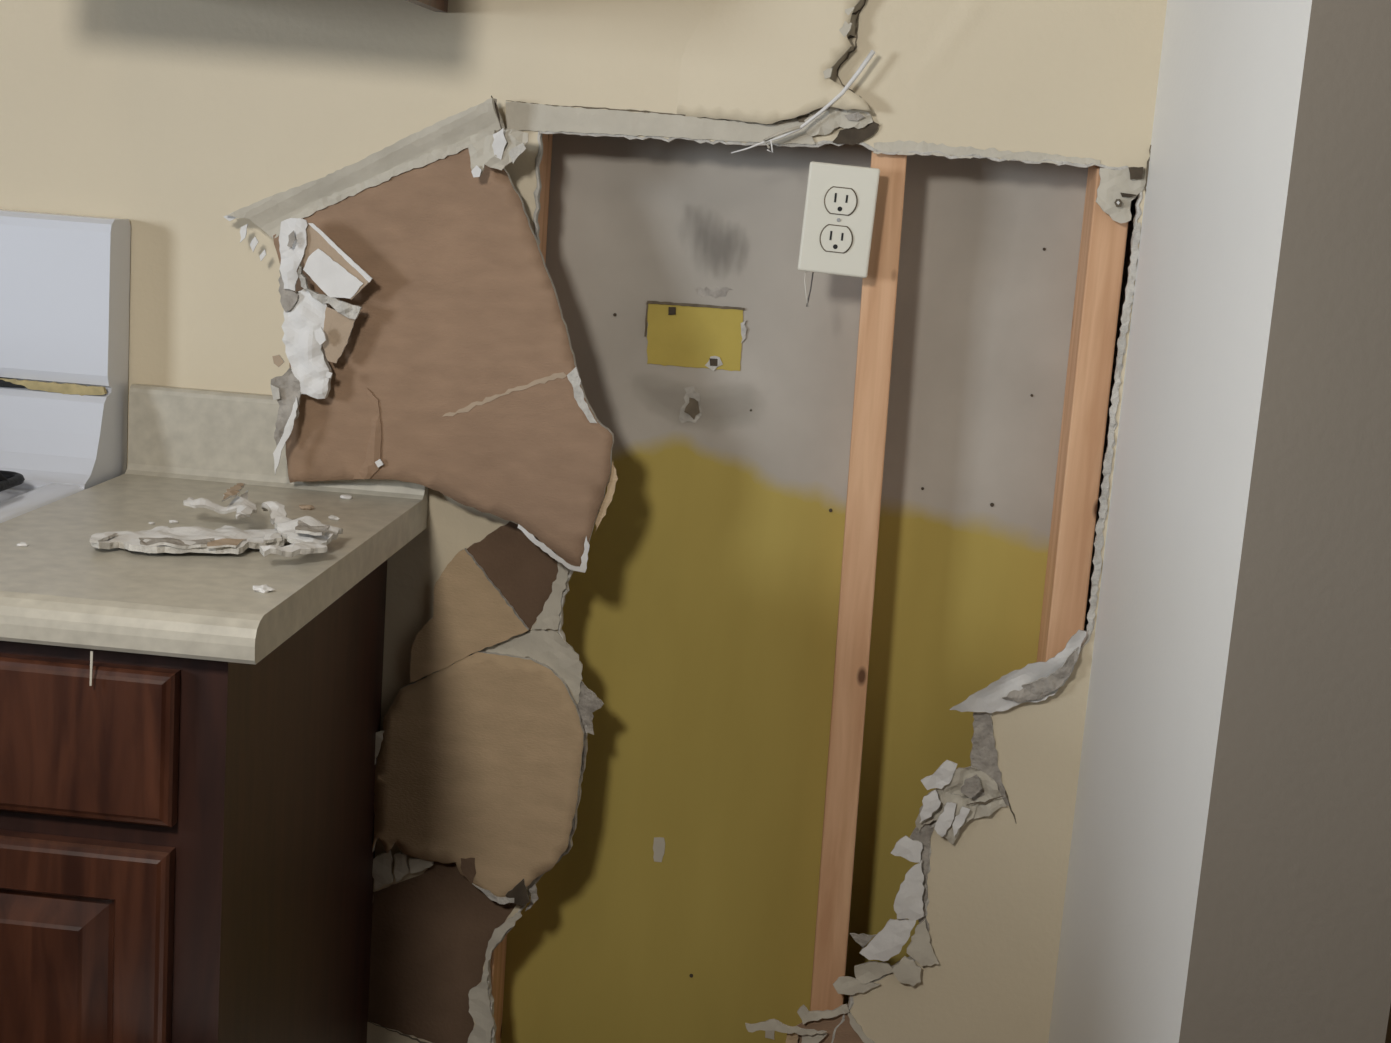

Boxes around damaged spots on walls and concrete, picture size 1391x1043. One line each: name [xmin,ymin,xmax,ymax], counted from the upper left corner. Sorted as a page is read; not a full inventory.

spalling [275,130,495,238]
peeling [314,327,326,345]
spalling [368,133,1146,1043]